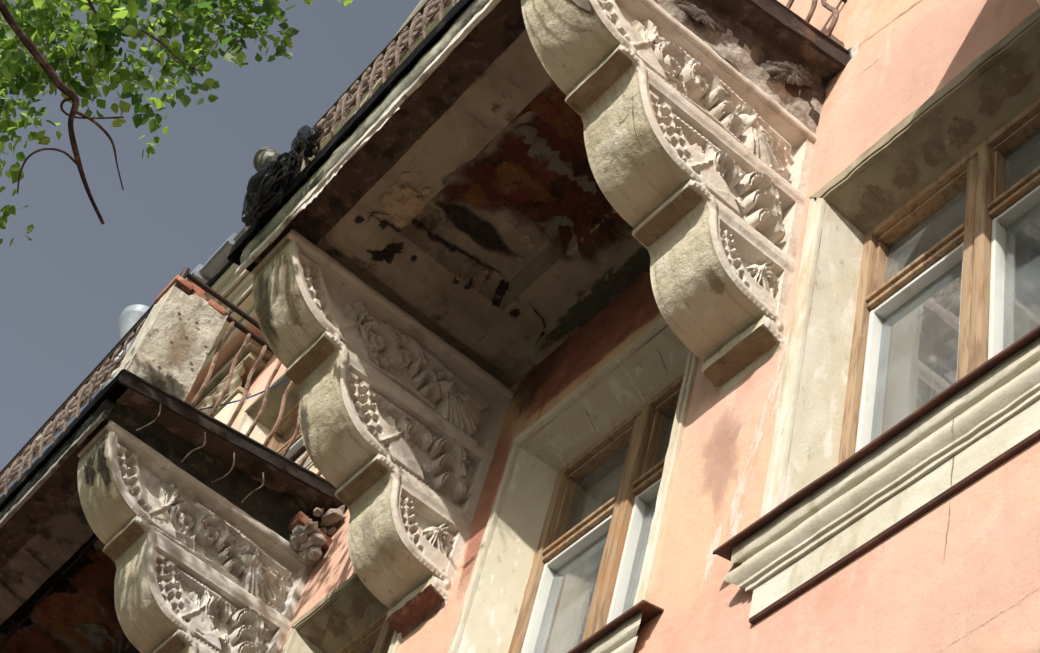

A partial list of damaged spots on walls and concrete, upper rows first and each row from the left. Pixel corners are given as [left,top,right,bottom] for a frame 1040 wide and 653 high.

spalling [676,0,726,34]
spalling [762,59,816,88]
spalling [294,107,400,215]
peeling [380,173,431,228]